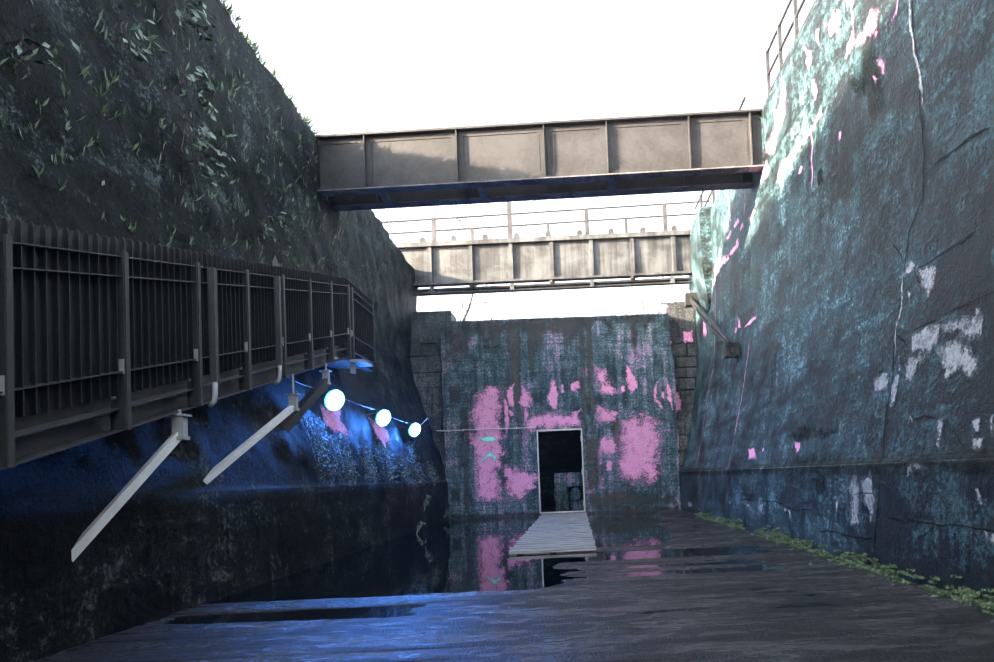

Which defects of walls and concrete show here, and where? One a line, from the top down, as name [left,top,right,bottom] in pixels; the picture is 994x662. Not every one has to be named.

leakage [442,314,679,520]
crack [743,0,994,555]